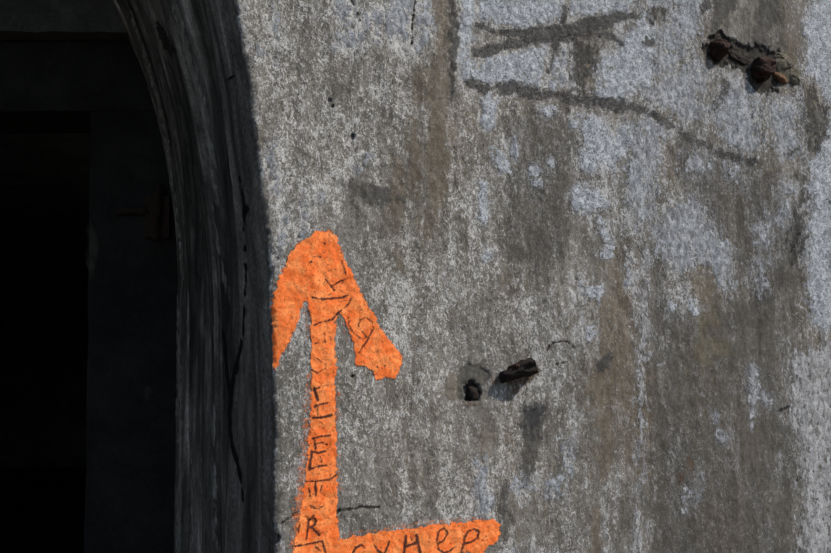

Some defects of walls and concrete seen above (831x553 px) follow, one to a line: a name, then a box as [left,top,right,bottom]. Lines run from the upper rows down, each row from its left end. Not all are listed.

water stain [784,84,831,157]
water stain [785,171,815,266]
crack [222,176,249,502]
rust [492,366,539,394]
water stain [627,242,657,553]
water stain [780,339,831,553]
water stain [498,481,513,541]